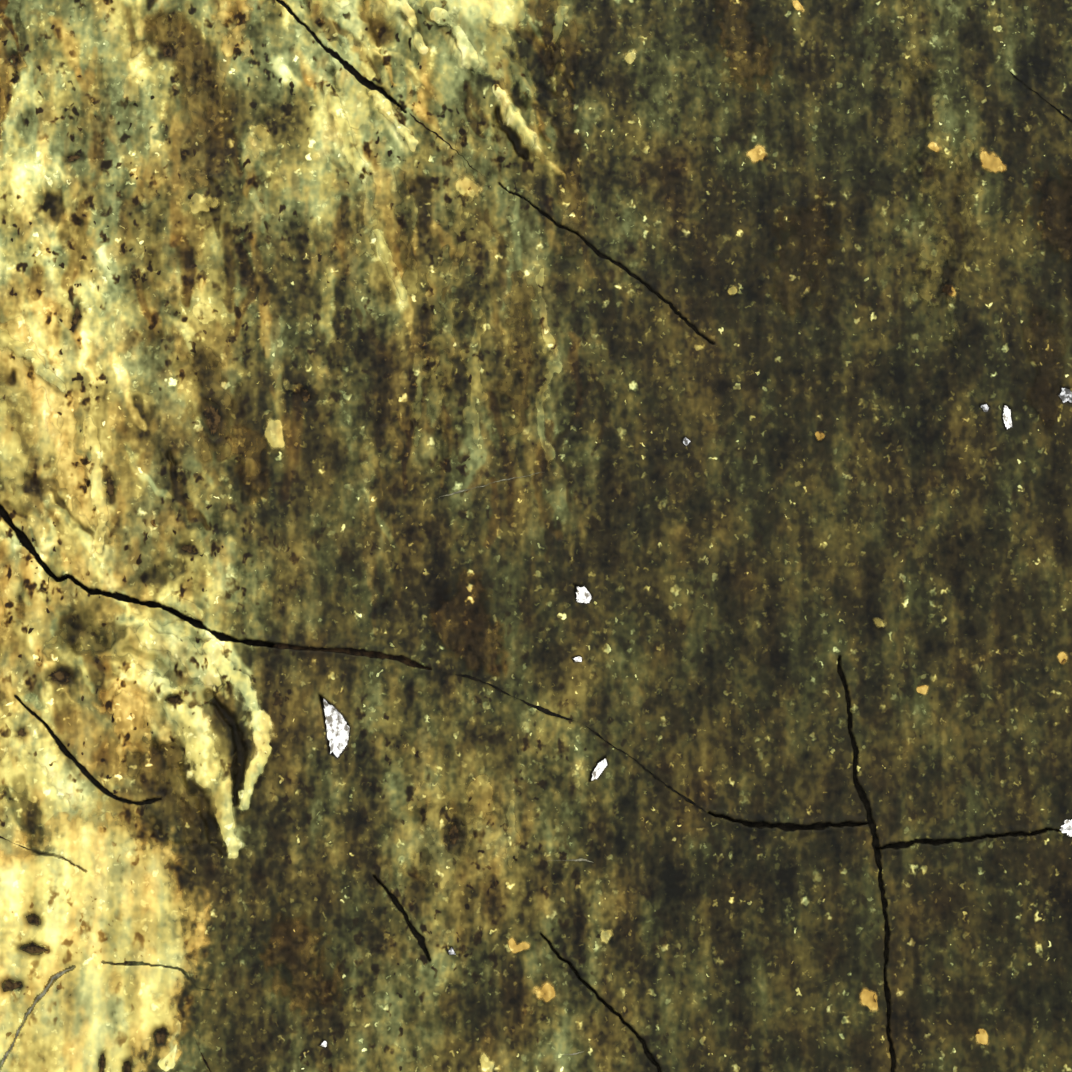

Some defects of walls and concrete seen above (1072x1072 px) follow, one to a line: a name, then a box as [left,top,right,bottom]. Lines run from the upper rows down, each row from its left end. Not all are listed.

crack [276,0,713,344]
damp [534,0,583,257]
damp [773,189,838,316]
damp [906,55,983,346]
damp [1023,306,1068,434]
peeling [323,699,350,758]
crack [0,505,1061,1072]